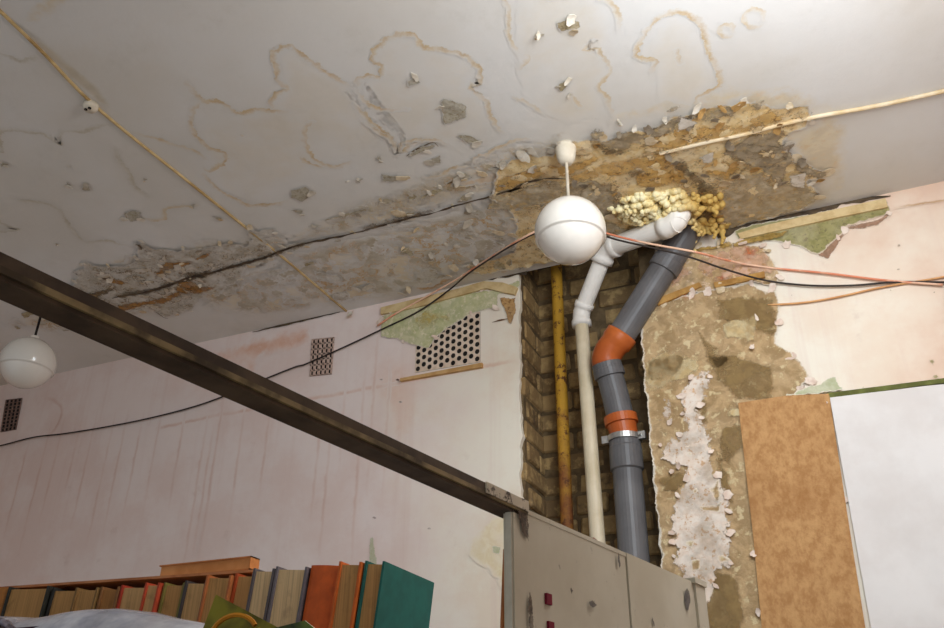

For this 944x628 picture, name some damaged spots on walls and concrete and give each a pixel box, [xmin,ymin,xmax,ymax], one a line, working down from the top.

leakage [131,31,505,208]
peeling [555,77,572,101]
peeling [557,14,580,36]
leakage [501,0,850,219]
crack [112,177,563,319]
leakage [200,136,563,315]
peeling [6,311,73,333]
leakage [307,351,516,442]
spalling [71,97,944,628]